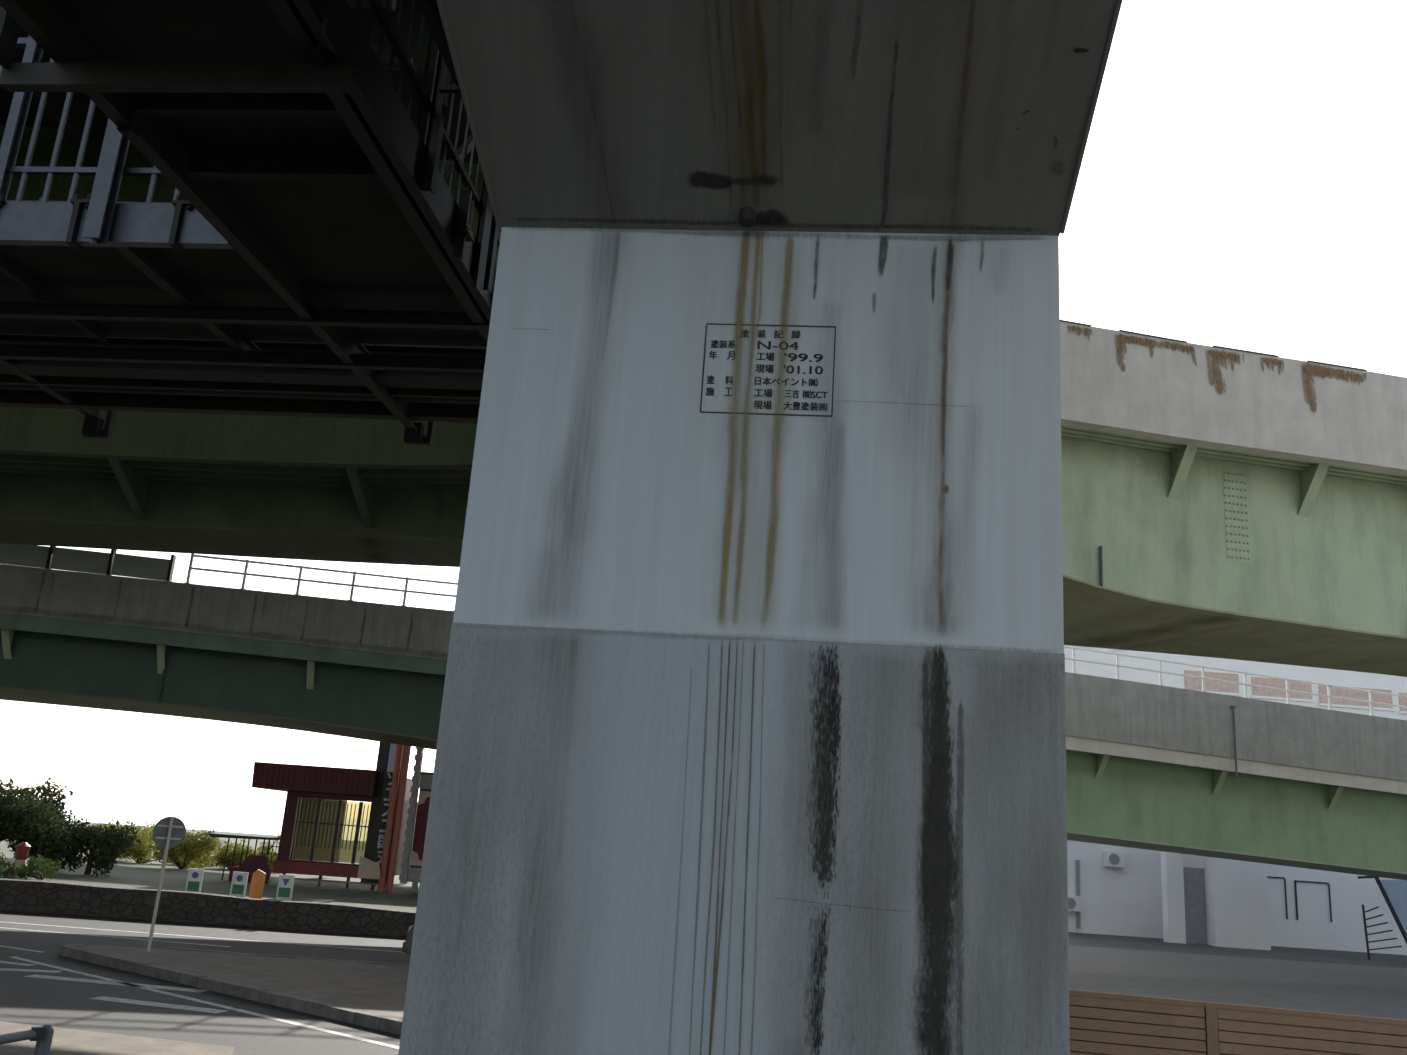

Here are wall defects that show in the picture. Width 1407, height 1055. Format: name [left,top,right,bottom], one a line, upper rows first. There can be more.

rust [736,233,763,377]
rust [782,240,792,349]
rust [1115,334,1244,395]
rust [1261,358,1284,374]
rust [1302,362,1366,412]
rust [720,423,745,618]
rust [766,445,778,604]
damp [810,641,842,1055]
damp [920,648,964,1055]